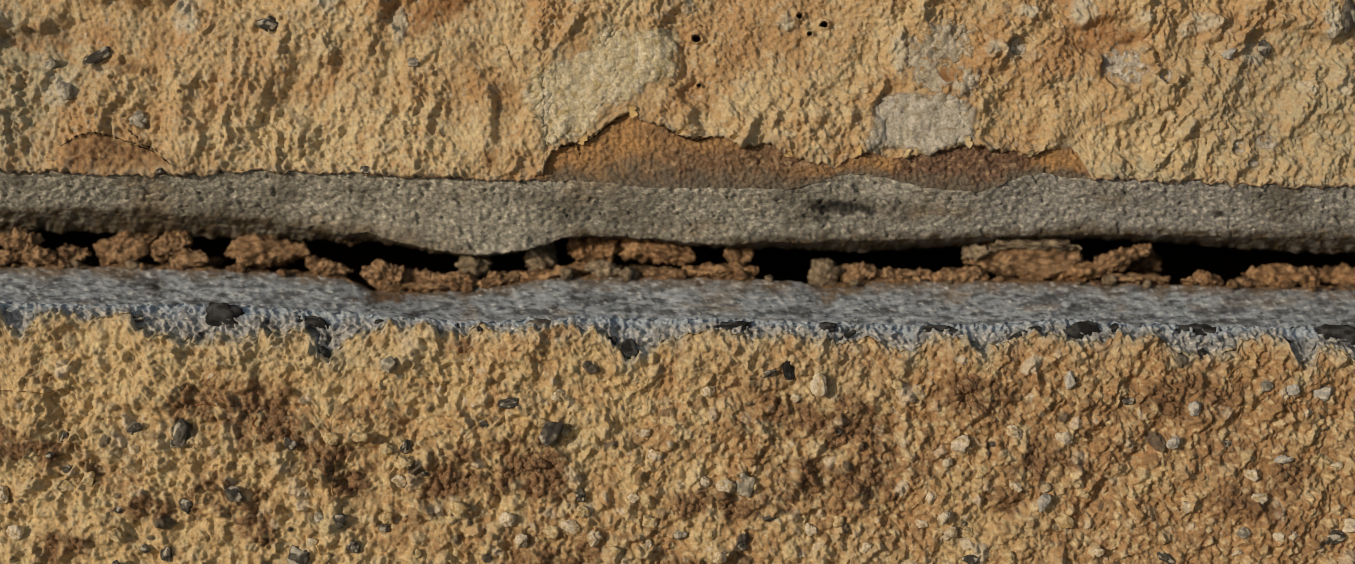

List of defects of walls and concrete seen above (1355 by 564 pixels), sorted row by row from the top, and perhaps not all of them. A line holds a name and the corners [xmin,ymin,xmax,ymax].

spalling [522,18,1093,193]